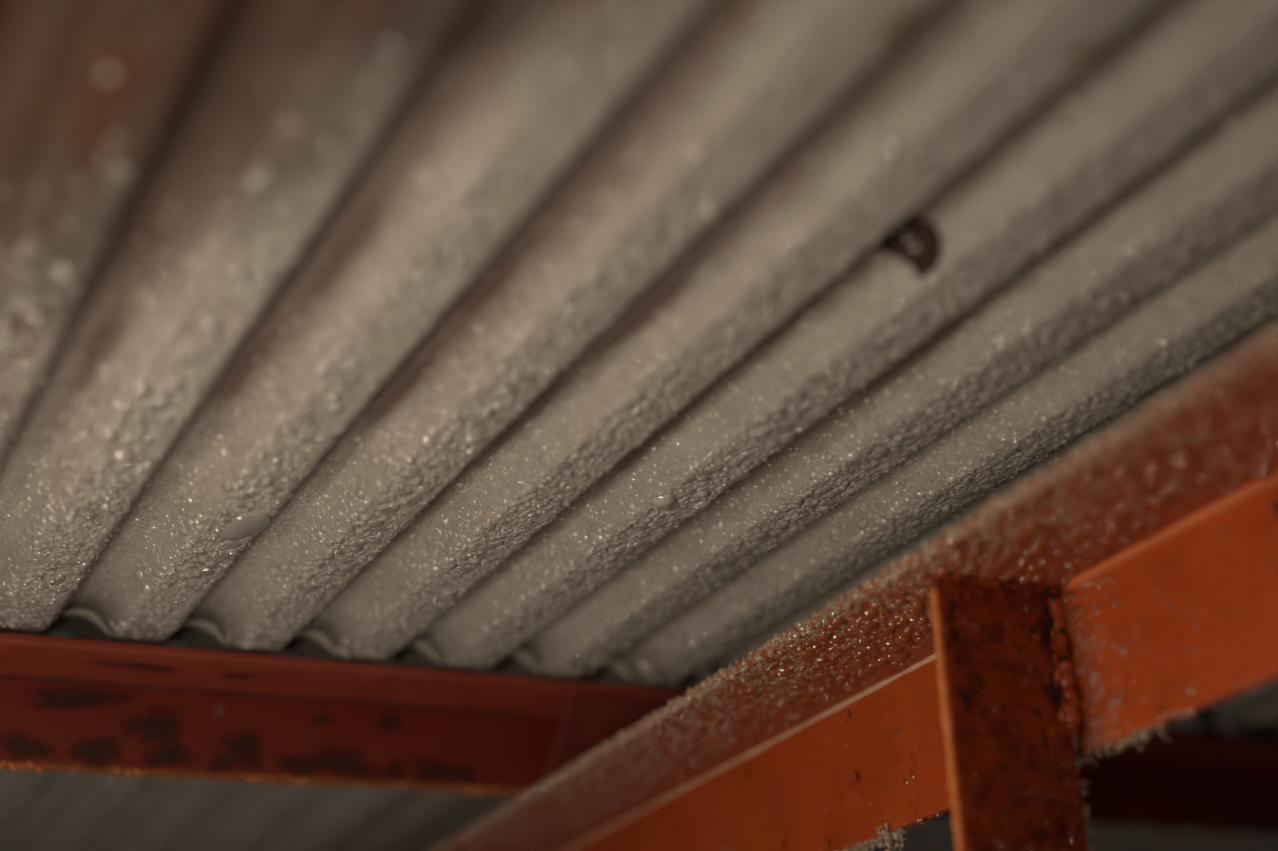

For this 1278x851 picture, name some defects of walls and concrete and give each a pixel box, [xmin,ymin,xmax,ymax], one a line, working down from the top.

rust [0,761,529,796]